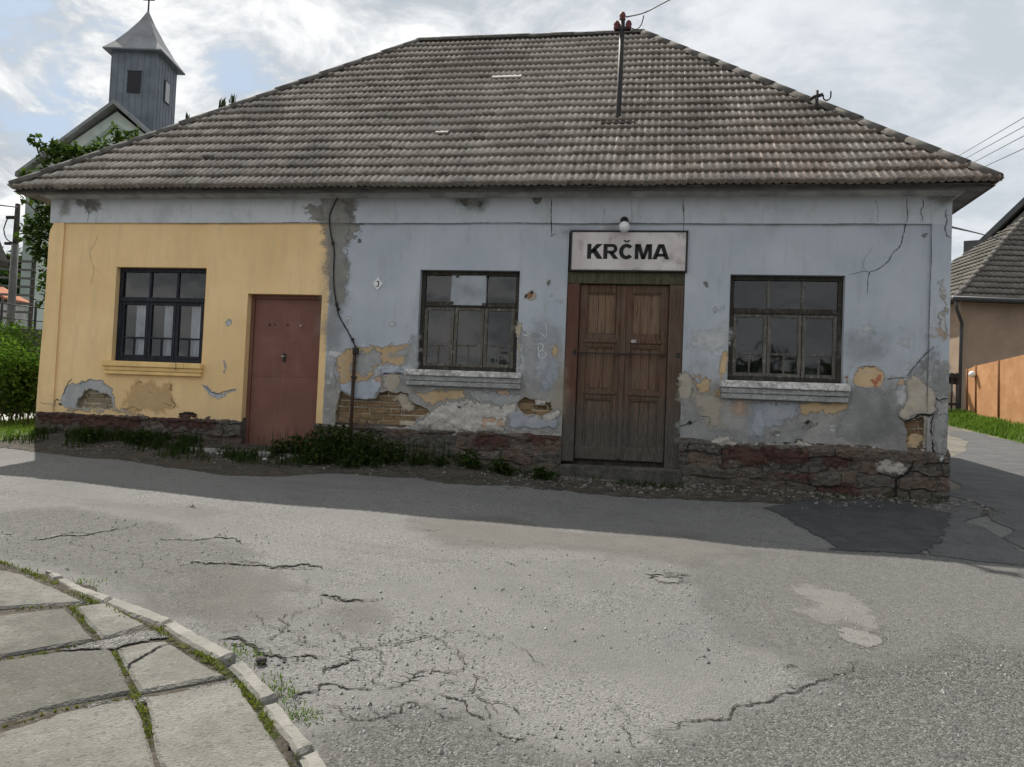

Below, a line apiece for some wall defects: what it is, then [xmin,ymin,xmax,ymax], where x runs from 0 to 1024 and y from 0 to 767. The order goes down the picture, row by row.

crack [348,197,725,237]
peeling [37,379,218,431]
peeling [202,384,236,400]
flaking render [328,343,560,448]
peeling [676,306,854,471]
crack [763,197,951,497]
peeling [845,365,885,388]
peeling [896,375,936,452]